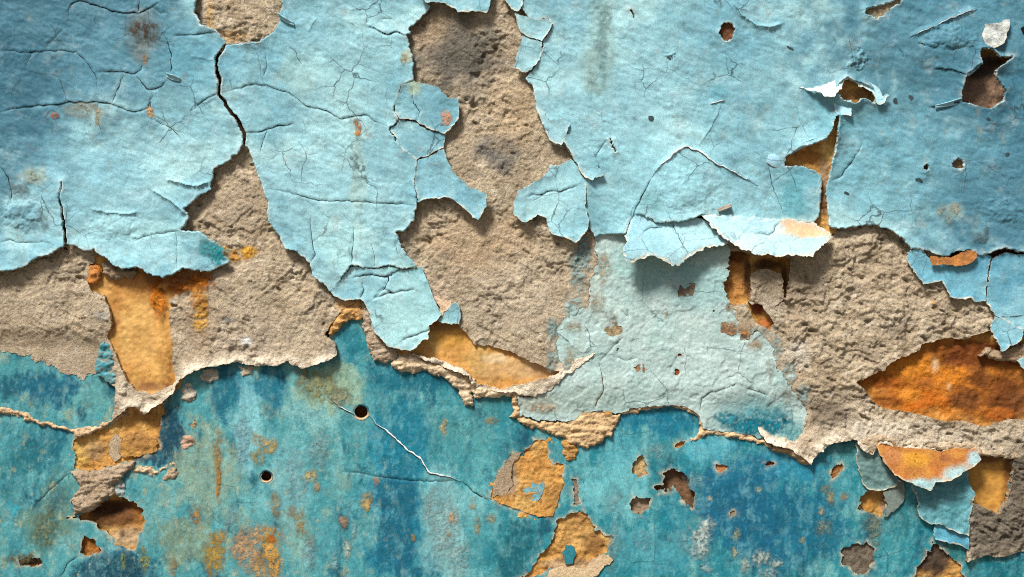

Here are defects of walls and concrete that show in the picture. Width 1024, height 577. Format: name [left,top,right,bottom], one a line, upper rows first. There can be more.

crack [4,0,379,151]
peeling [962,48,1012,120]
crack [628,100,785,227]
crack [6,185,70,250]
crack [91,181,210,268]
flaking render [0,0,623,471]
crack [267,177,415,265]
flaking render [622,78,1024,577]
crack [329,396,488,500]
spalling [67,495,145,556]
spalling [483,437,614,577]